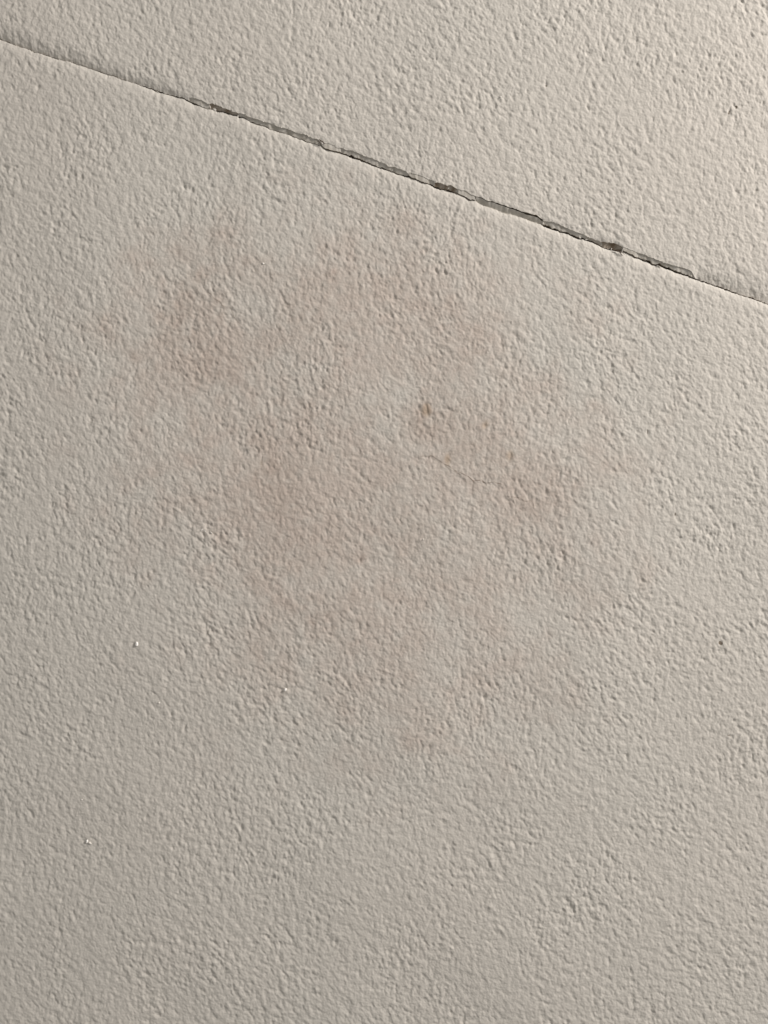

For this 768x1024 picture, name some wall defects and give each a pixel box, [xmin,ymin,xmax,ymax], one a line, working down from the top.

crack [0,39,768,305]